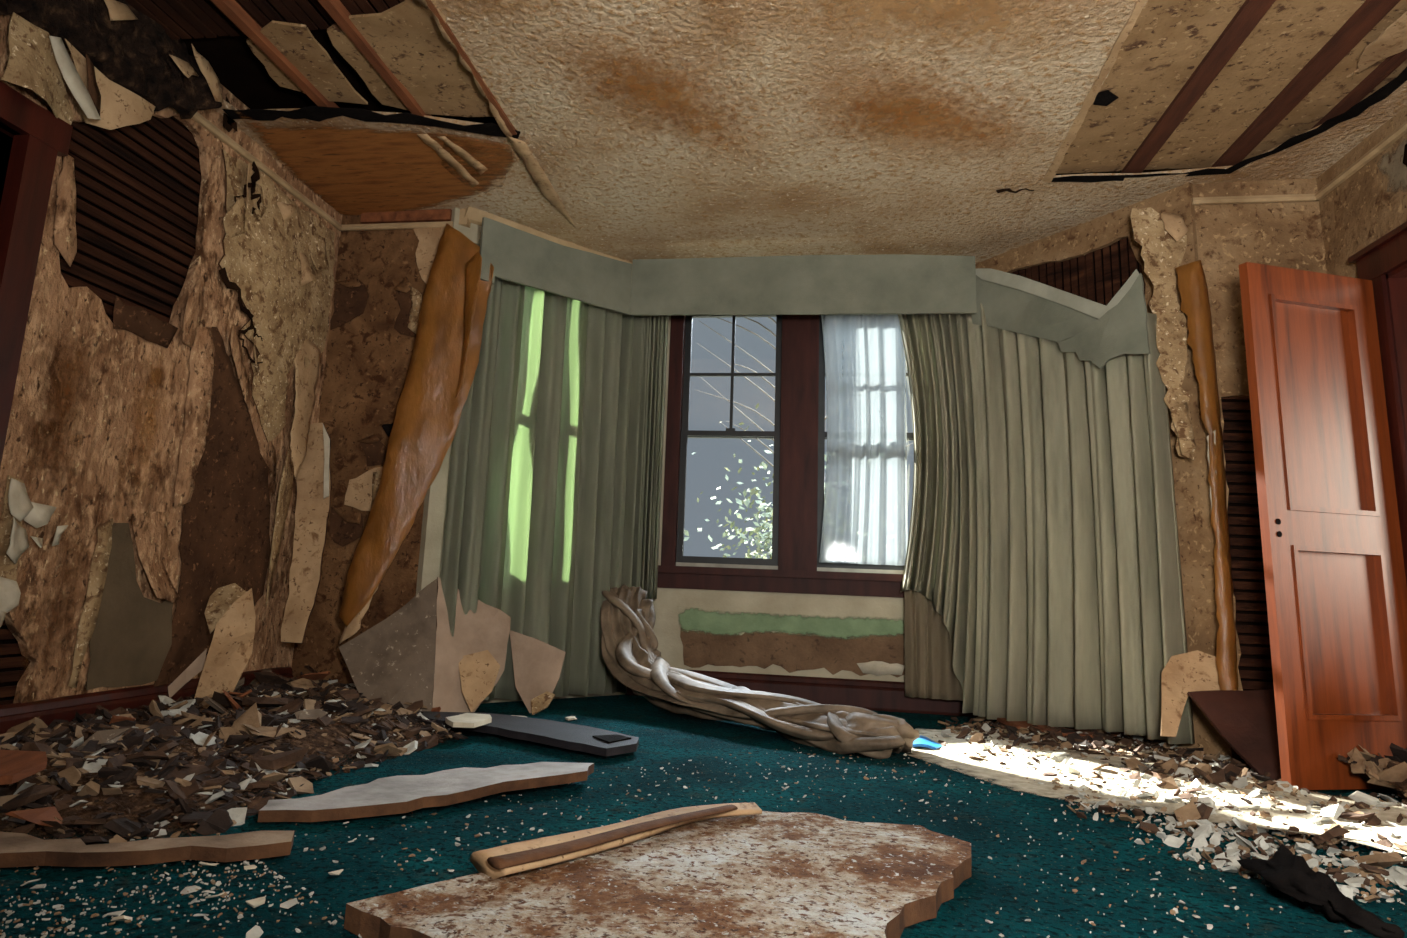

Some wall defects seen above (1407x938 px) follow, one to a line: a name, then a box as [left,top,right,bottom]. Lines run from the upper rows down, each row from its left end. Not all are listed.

water stain [580,56,739,146]
water stain [824,80,1008,146]
peeling [54,155,77,267]
peeling [237,112,576,228]
peeling [113,272,206,348]
crack [219,267,263,364]
peeling [1130,207,1196,460]
peeling [0,475,68,627]
flaking render [68,512,180,690]